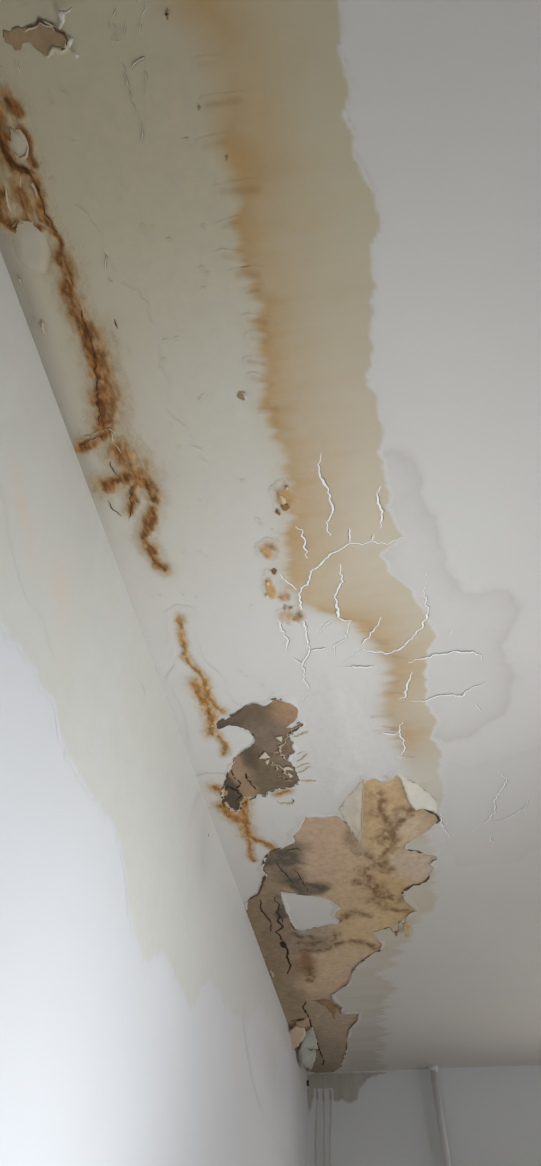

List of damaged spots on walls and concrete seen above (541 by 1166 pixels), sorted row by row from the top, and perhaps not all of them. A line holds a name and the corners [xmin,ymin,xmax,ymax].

peeling [3,7,80,59]
corrosion [0,0,303,868]
leakage [40,0,541,867]
crack [278,452,486,758]
peeling [212,695,441,1073]